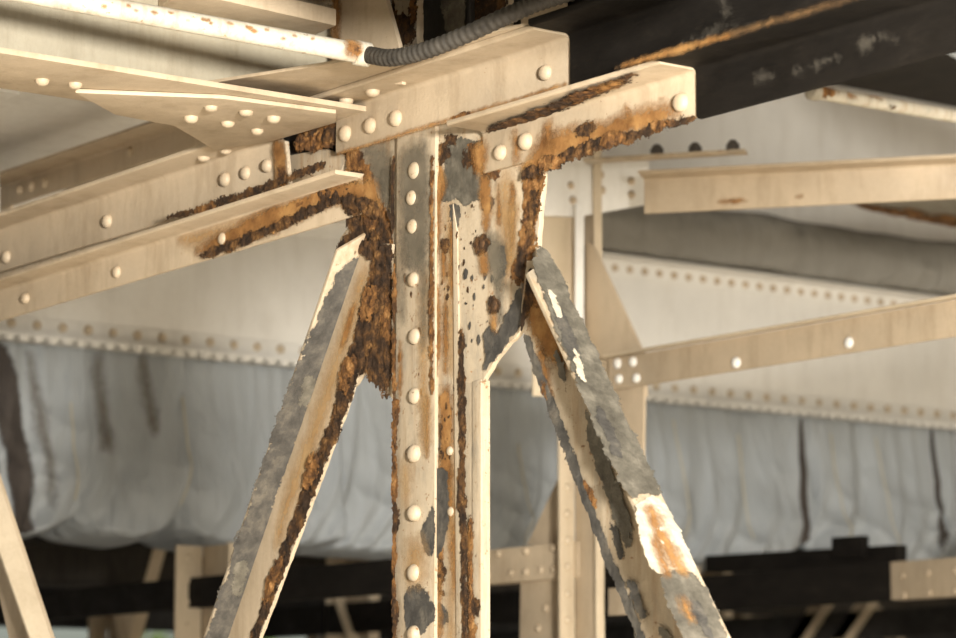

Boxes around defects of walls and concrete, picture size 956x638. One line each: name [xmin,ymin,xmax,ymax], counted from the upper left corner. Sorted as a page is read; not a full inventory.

peeling [439,136,525,372]
rust [166,0,855,638]
rust [851,204,956,228]
leakage [0,343,34,534]
leakage [29,363,52,478]
peeling [205,257,359,638]
peeling [420,395,453,558]
peeling [532,246,728,638]
leakage [798,417,811,547]
leakage [930,430,950,555]
peeling [404,584,449,635]